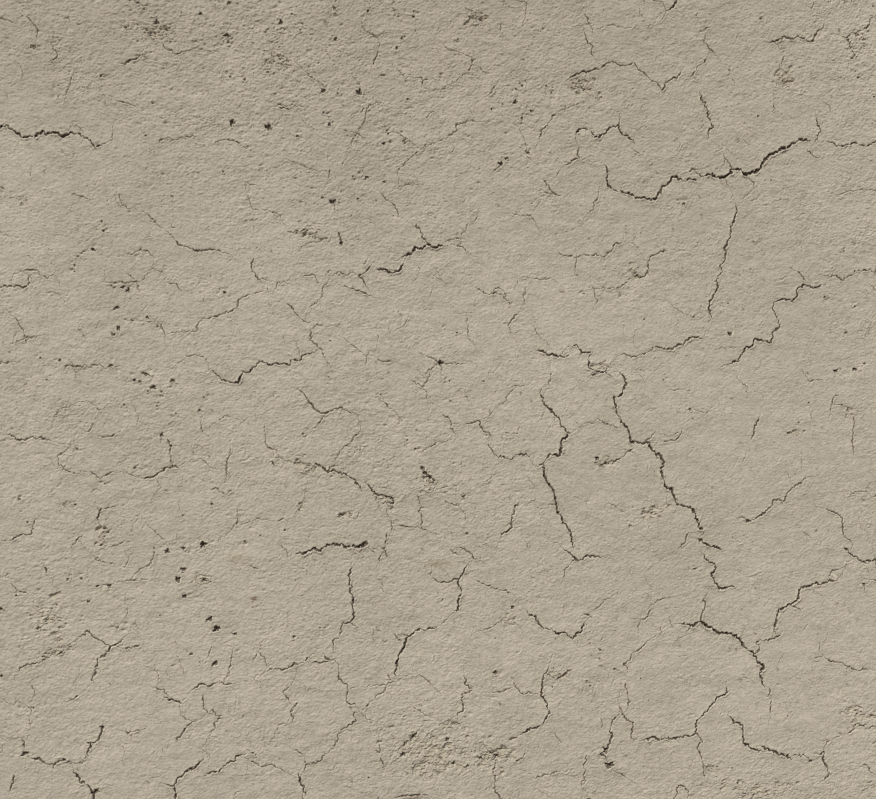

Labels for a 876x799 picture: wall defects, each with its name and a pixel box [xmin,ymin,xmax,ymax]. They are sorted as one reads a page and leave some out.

crack [120,34,207,71]
crack [519,0,717,161]
crack [764,2,876,117]
crack [0,125,114,156]
crack [0,225,97,311]
crack [100,102,488,384]
crack [0,315,42,366]
crack [65,359,103,375]